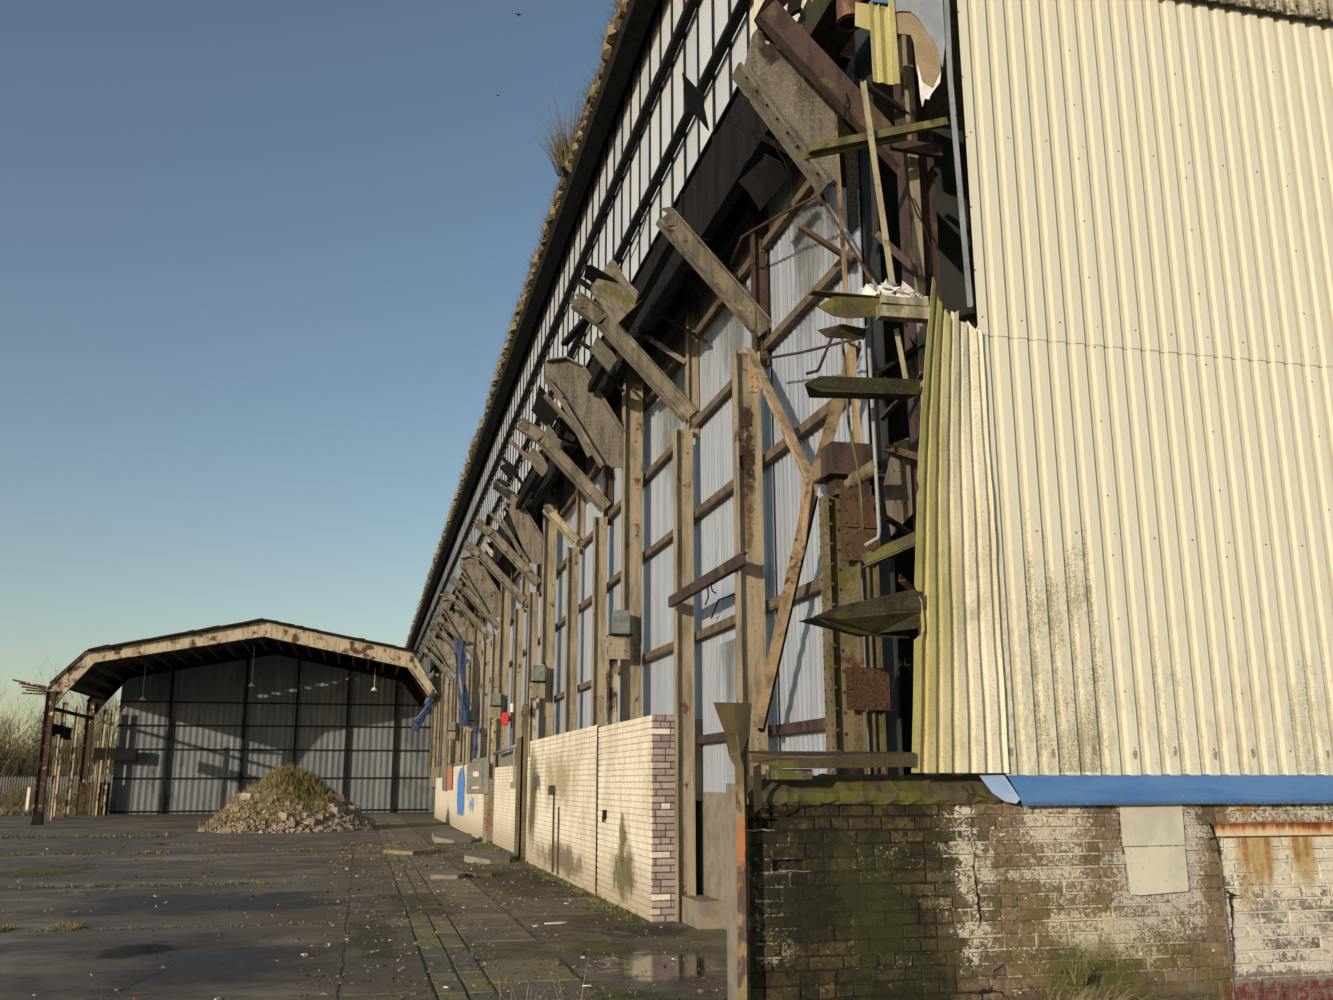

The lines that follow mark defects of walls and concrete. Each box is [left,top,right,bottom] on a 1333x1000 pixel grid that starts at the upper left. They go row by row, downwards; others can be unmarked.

water stain [1027,538,1108,772]
water stain [747,804,990,1000]
crack [962,784,986,923]
peeling [748,803,1333,1000]
crack [1209,822,1220,858]
crack [1226,891,1240,968]
rust [1240,836,1273,895]
rust [1292,835,1315,879]